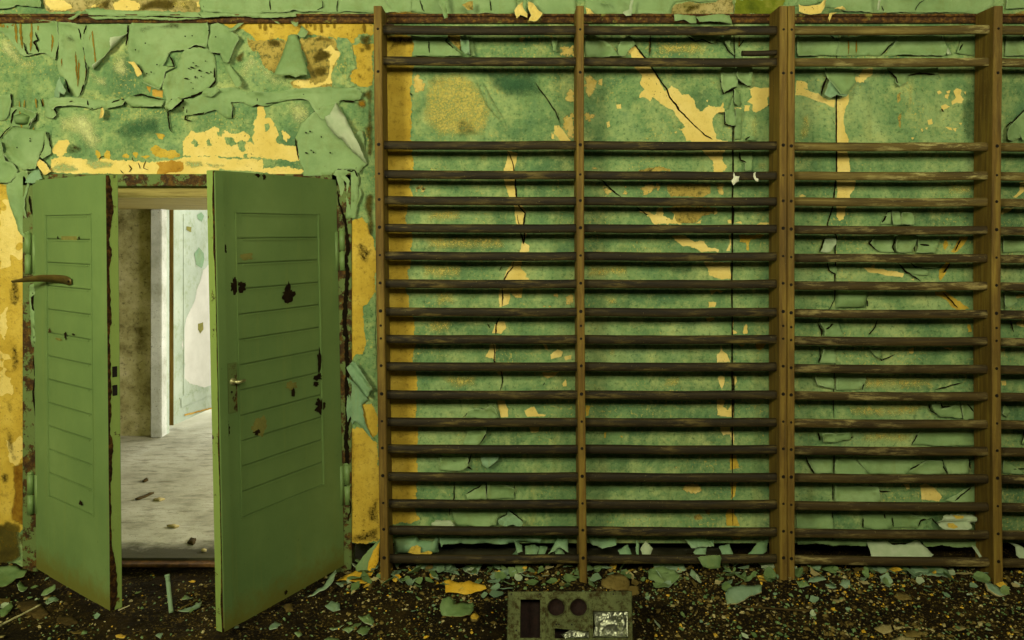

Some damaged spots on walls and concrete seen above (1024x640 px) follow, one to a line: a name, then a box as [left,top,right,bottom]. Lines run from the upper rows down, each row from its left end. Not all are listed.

corrosion [0,23,39,51]
corrosion [75,30,96,86]
peeling [795,35,975,221]
flaking render [0,0,785,632]
crack [488,151,526,390]
crack [617,36,751,521]
crack [817,35,841,413]
crack [449,408,523,521]
crack [805,433,853,540]
crack [862,484,938,527]
crack [910,382,974,501]
peeling [1008,542,1024,558]